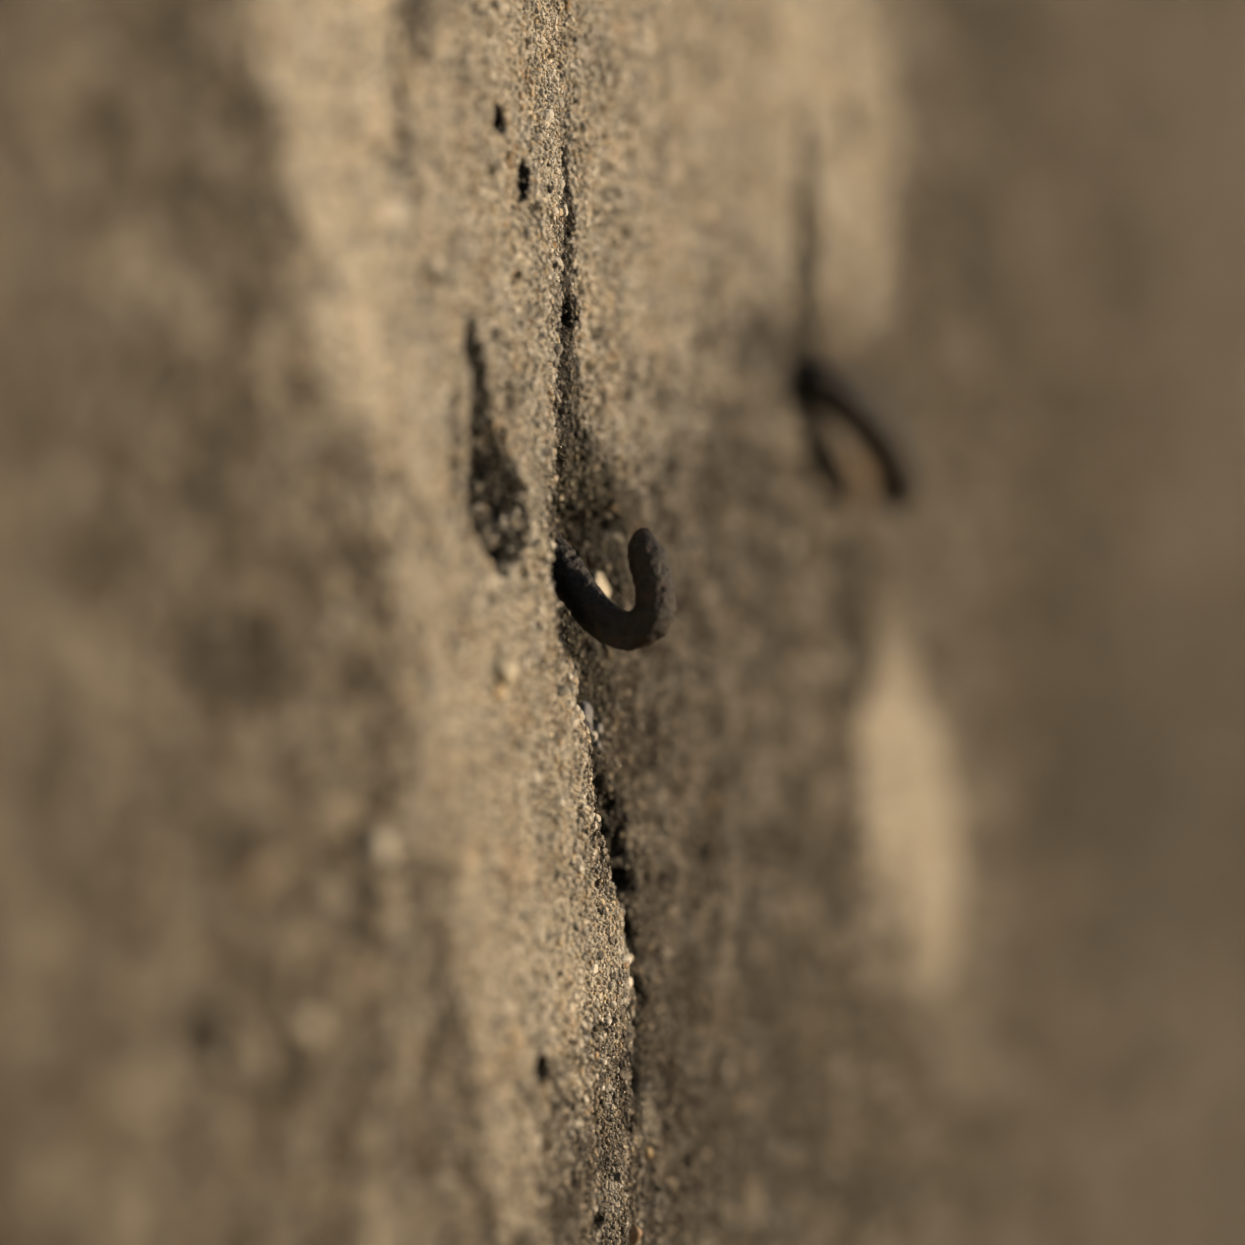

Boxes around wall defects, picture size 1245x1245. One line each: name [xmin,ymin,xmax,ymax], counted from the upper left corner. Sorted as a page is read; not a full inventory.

crack [553,127,609,465]
crack [592,784,648,1129]